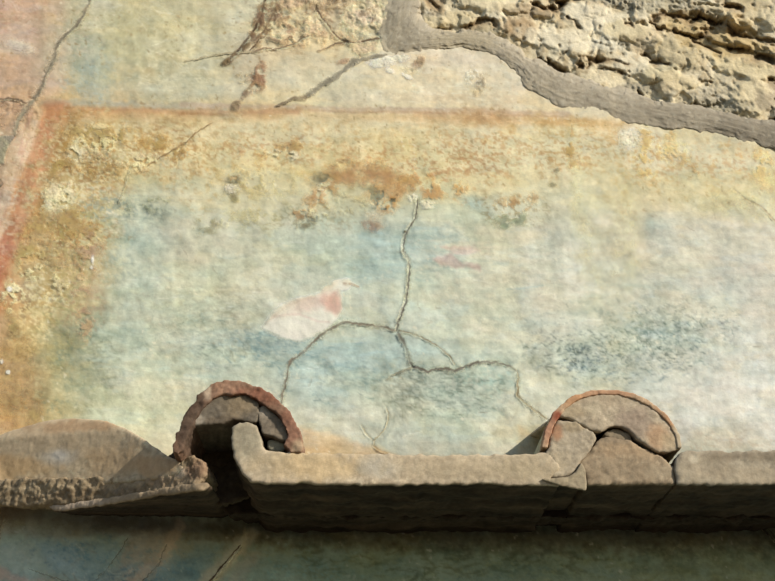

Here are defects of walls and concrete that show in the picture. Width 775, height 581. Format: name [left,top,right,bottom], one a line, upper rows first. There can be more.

crack [0,0,92,136]
crack [184,0,387,106]
spalling [420,0,775,120]
crack [280,199,547,419]
crack [209,545,241,581]